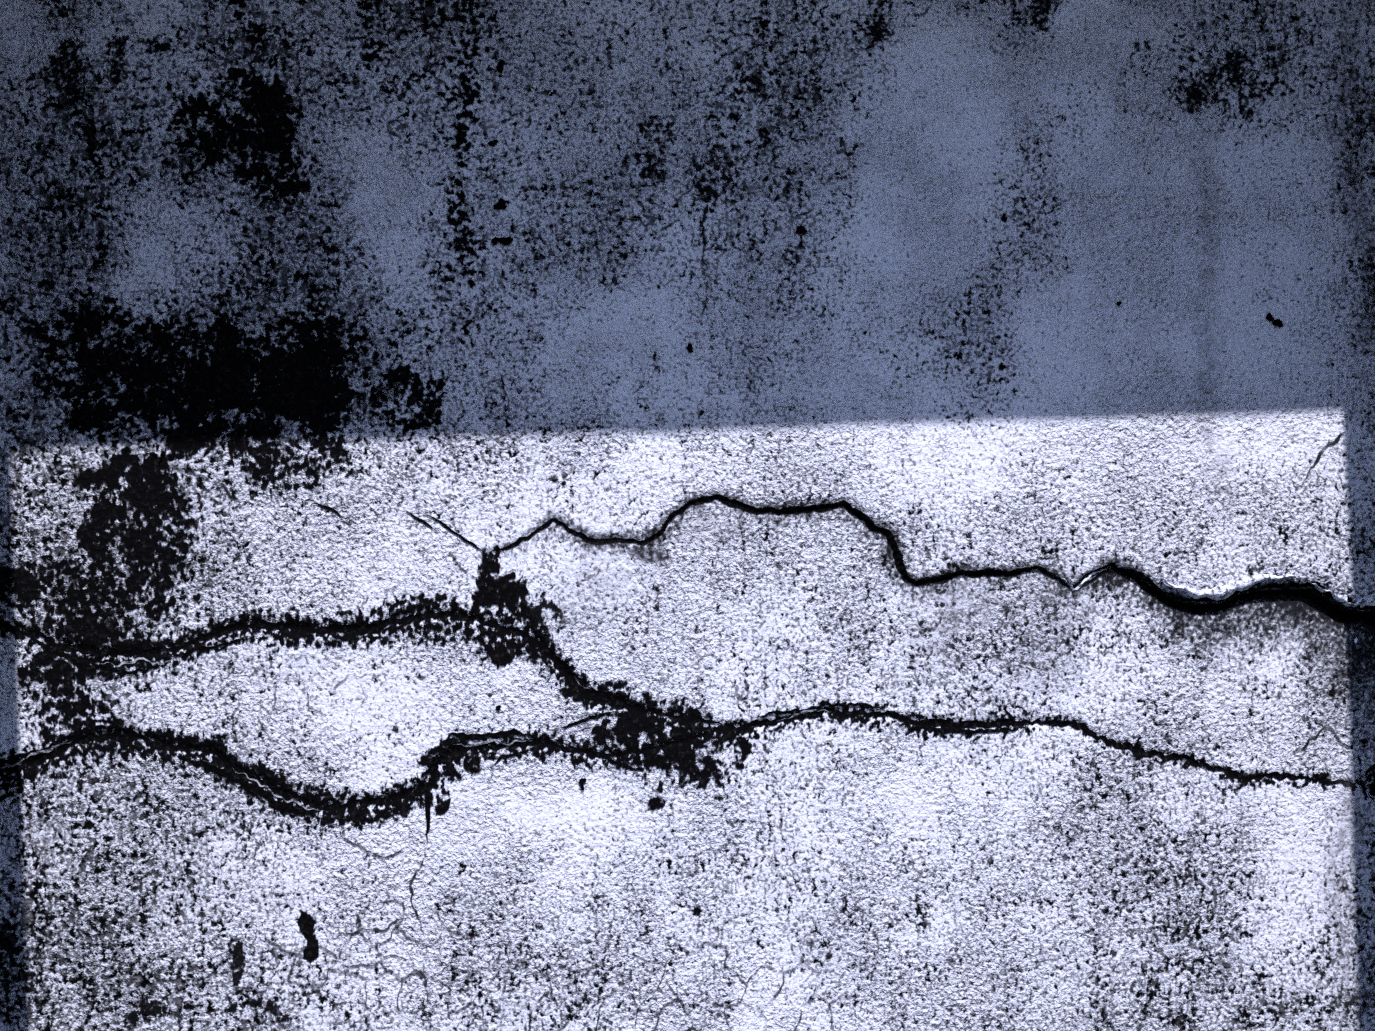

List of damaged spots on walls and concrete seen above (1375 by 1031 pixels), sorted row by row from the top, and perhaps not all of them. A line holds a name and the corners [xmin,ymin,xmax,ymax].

water stain [83,114,99,156]
water stain [0,277,446,746]
crack [0,491,1375,1031]